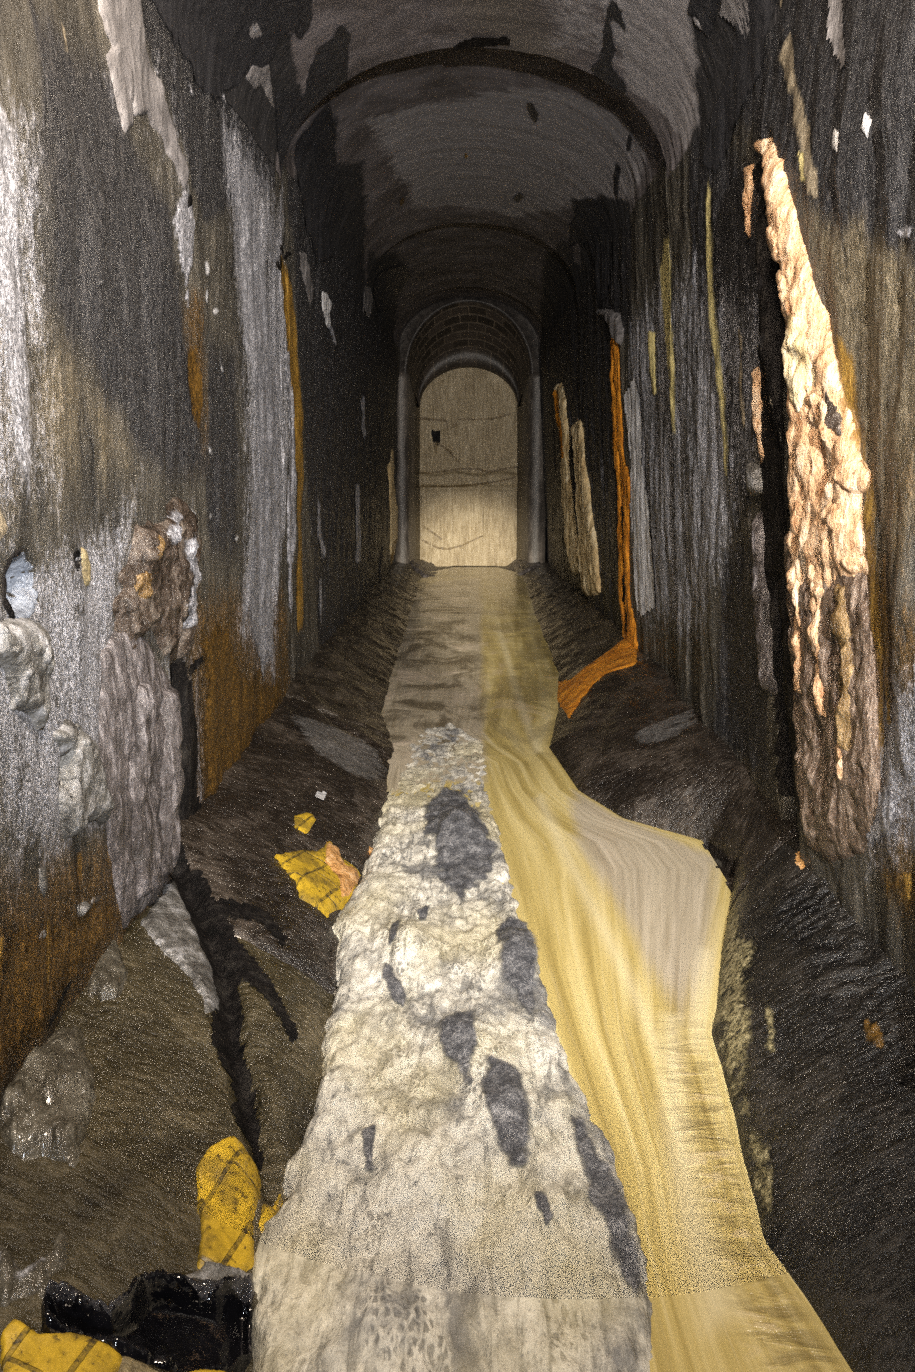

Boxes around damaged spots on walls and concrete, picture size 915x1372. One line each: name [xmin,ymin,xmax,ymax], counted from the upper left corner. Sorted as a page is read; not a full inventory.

efflorescence [0,107,31,492]
hole [73,547,91,587]
spalling [113,497,202,665]
corrosion [276,245,304,632]
corrosion [557,338,638,718]